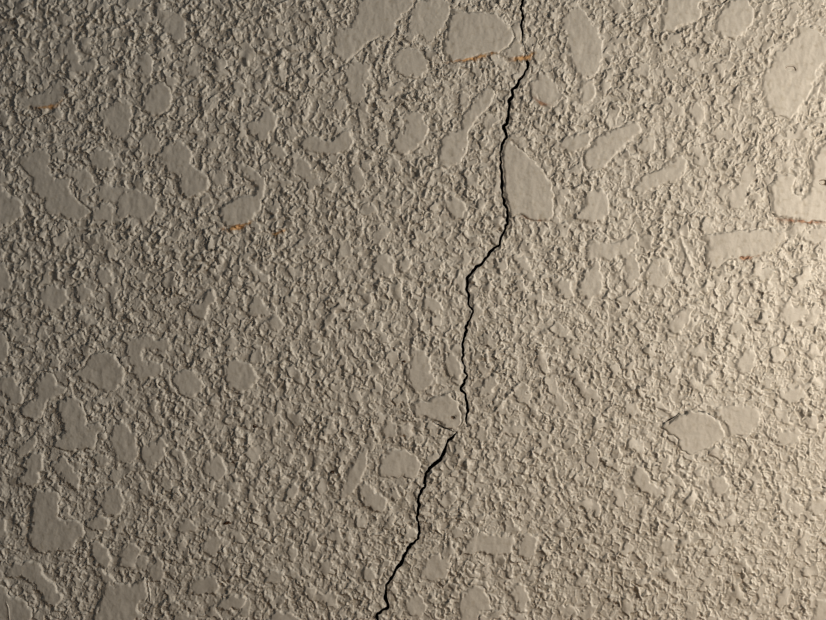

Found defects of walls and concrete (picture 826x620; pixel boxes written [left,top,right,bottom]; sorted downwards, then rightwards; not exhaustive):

crack [374,0,530,620]